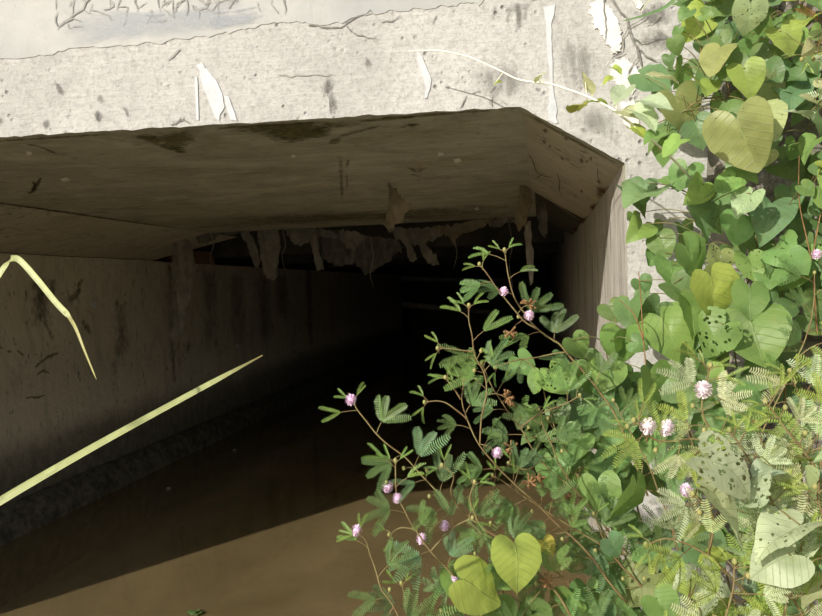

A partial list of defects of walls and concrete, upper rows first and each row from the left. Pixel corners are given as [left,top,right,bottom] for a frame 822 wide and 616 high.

crack [55,0,237,29]
spalling [588,0,640,133]
peeling [224,95,237,121]
peeling [548,102,558,124]
crack [0,178,172,228]
crack [0,252,148,260]